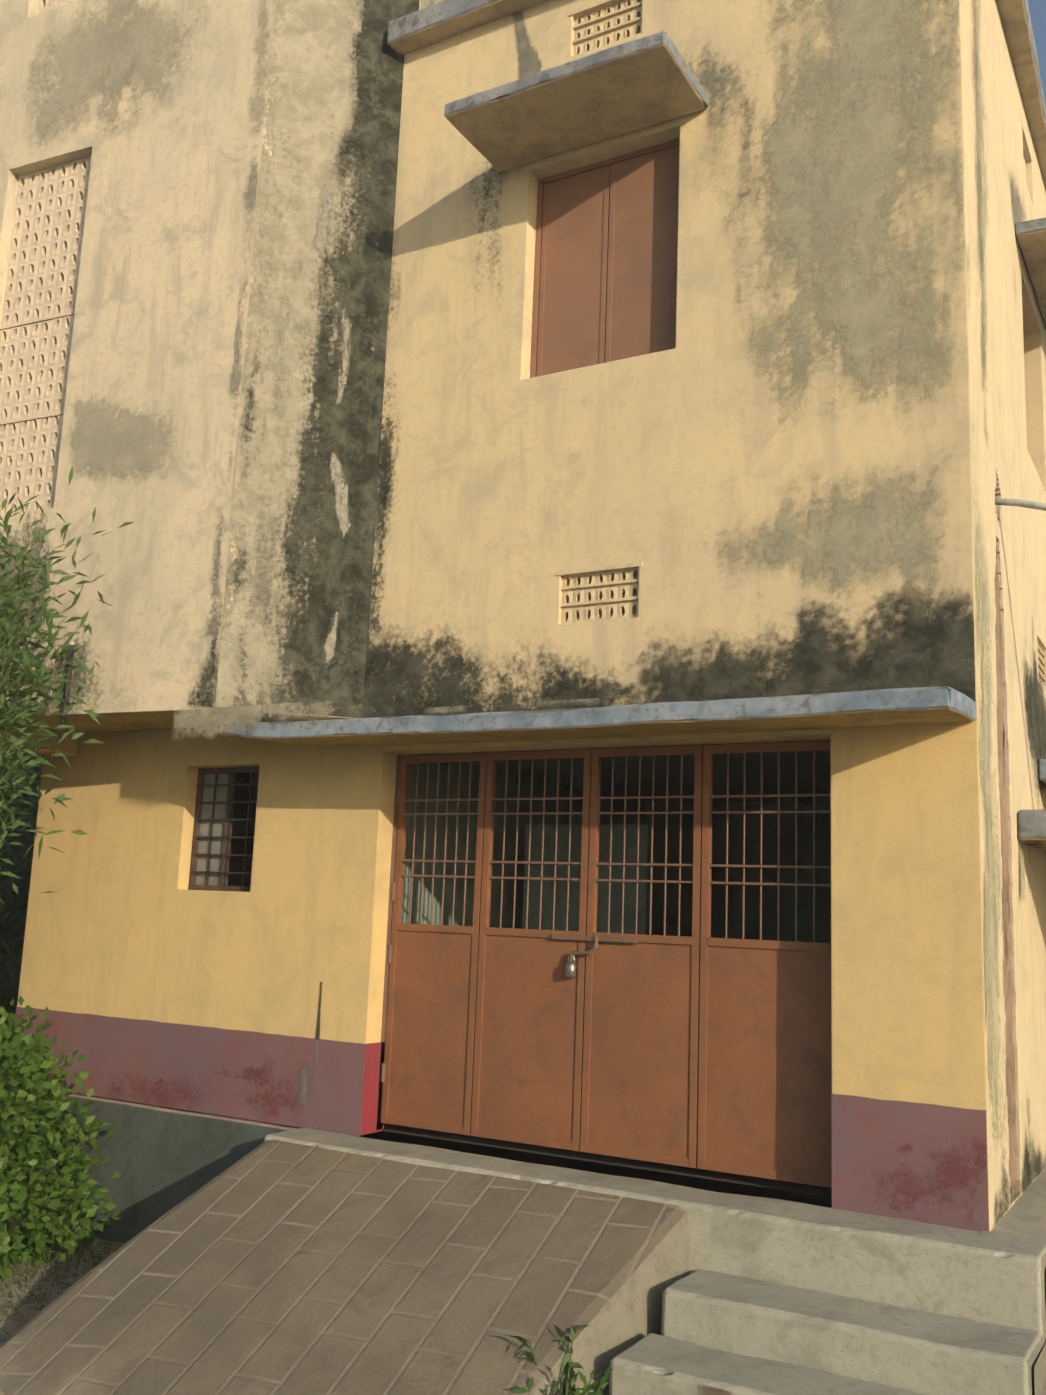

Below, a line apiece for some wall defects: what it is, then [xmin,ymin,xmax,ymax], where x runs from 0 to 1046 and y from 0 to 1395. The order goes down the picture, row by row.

water stain [29,0,186,139]
water stain [71,399,173,477]
water stain [174,0,986,737]
water stain [1024,654,1046,797]
spalling [994,468,1020,1202]
water stain [995,1101,1046,1225]